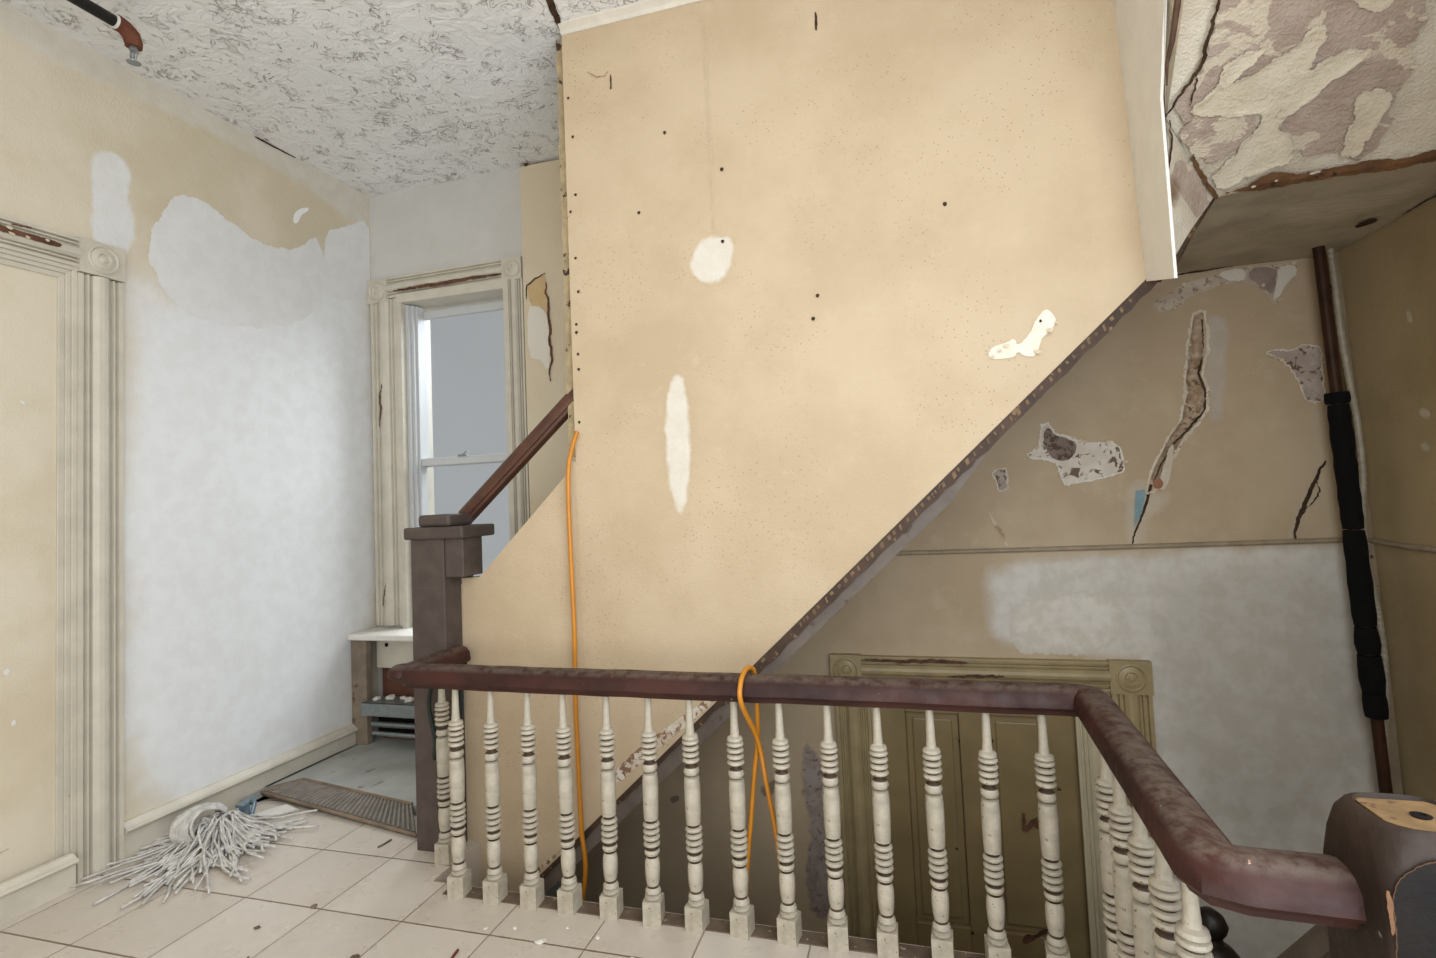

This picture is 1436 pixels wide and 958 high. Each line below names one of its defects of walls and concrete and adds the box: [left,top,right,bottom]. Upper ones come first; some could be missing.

peeling [1170,0,1429,217]
peeling [293,208,309,223]
peeling [1264,344,1326,404]
spalling [747,261,1299,674]
crack [1293,460,1326,539]
spalling [537,815,603,879]